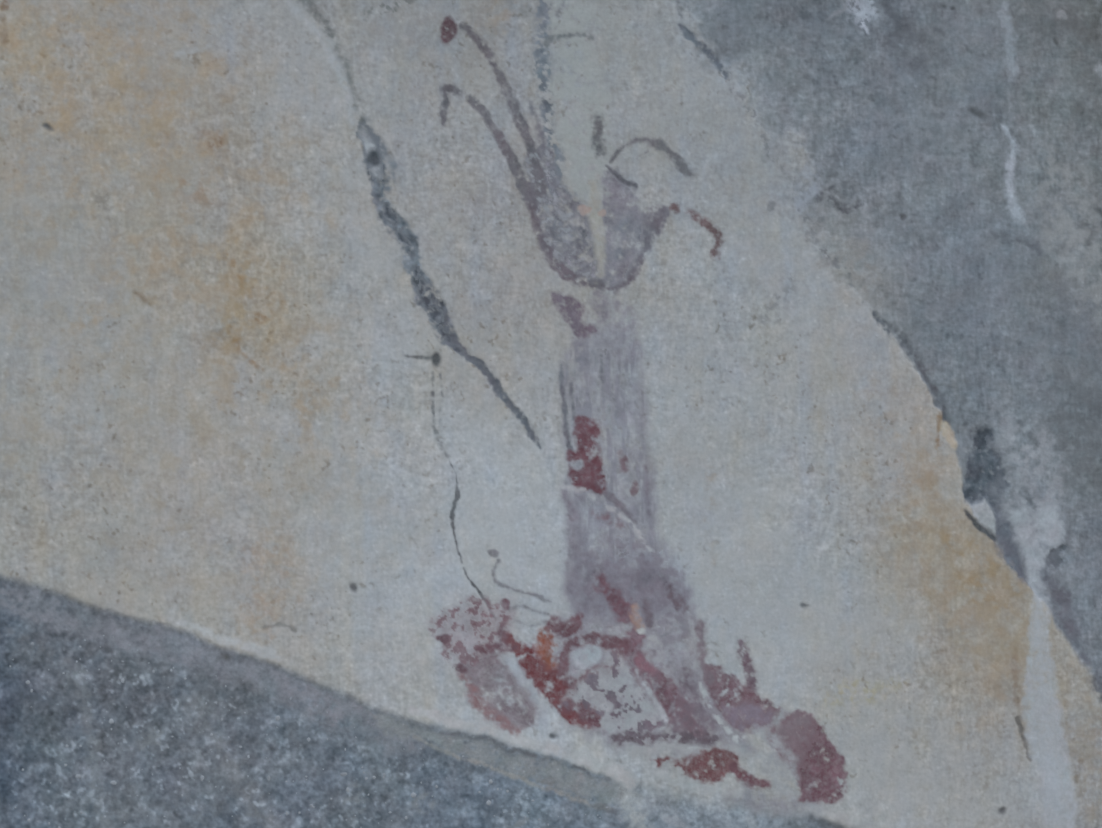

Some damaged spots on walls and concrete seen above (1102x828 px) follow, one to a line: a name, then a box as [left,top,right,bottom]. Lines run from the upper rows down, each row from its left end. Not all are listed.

spalling [824,0,881,41]
crack [282,0,544,593]
spalling [870,307,1023,579]
spalling [1042,542,1102,702]